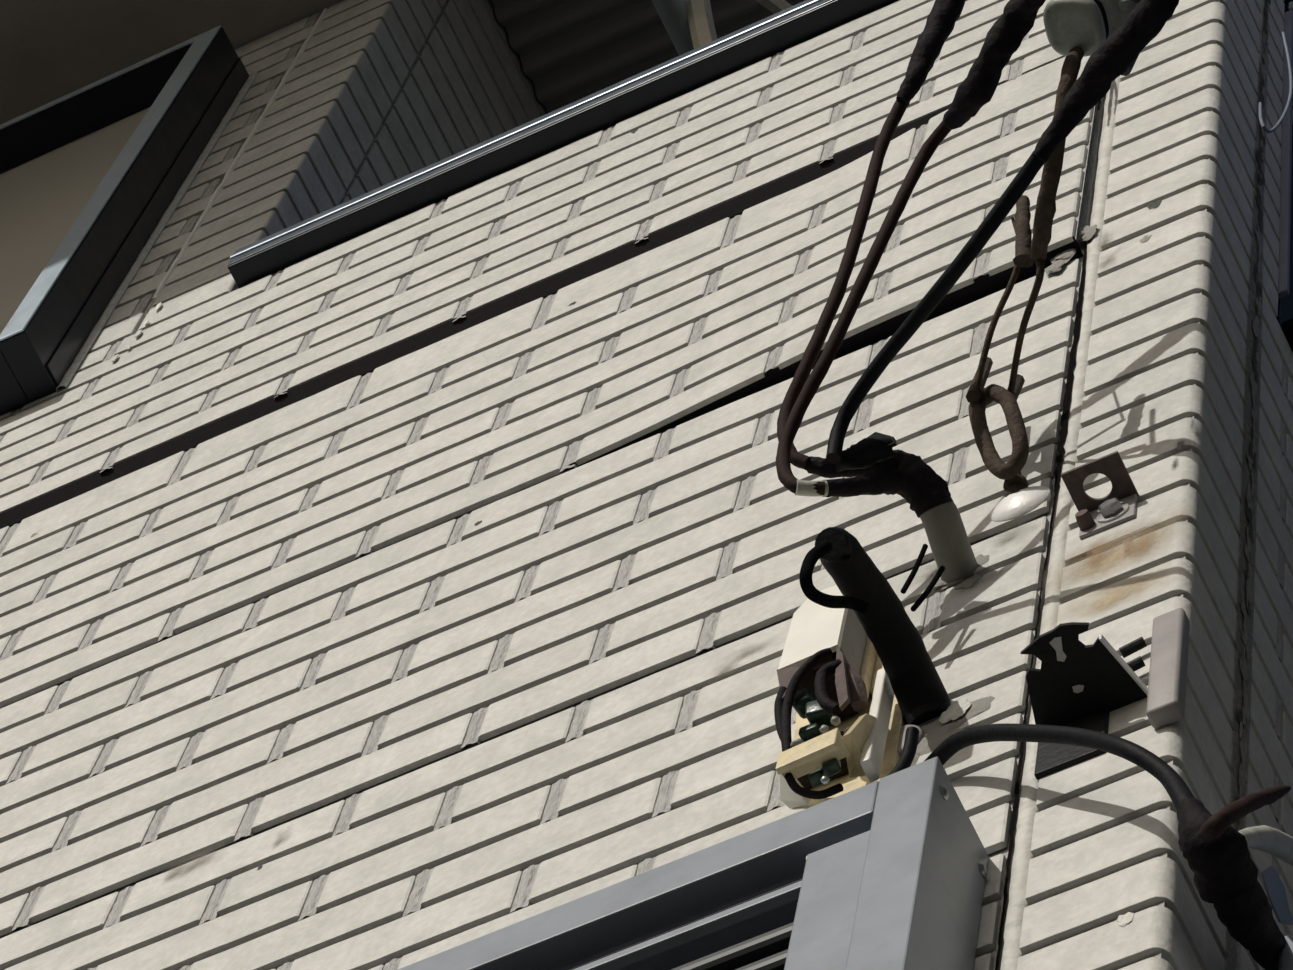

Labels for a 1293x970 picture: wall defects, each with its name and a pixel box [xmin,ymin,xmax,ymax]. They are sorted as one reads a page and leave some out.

corrosion [1072,525,1161,575]
corrosion [1092,579,1143,610]